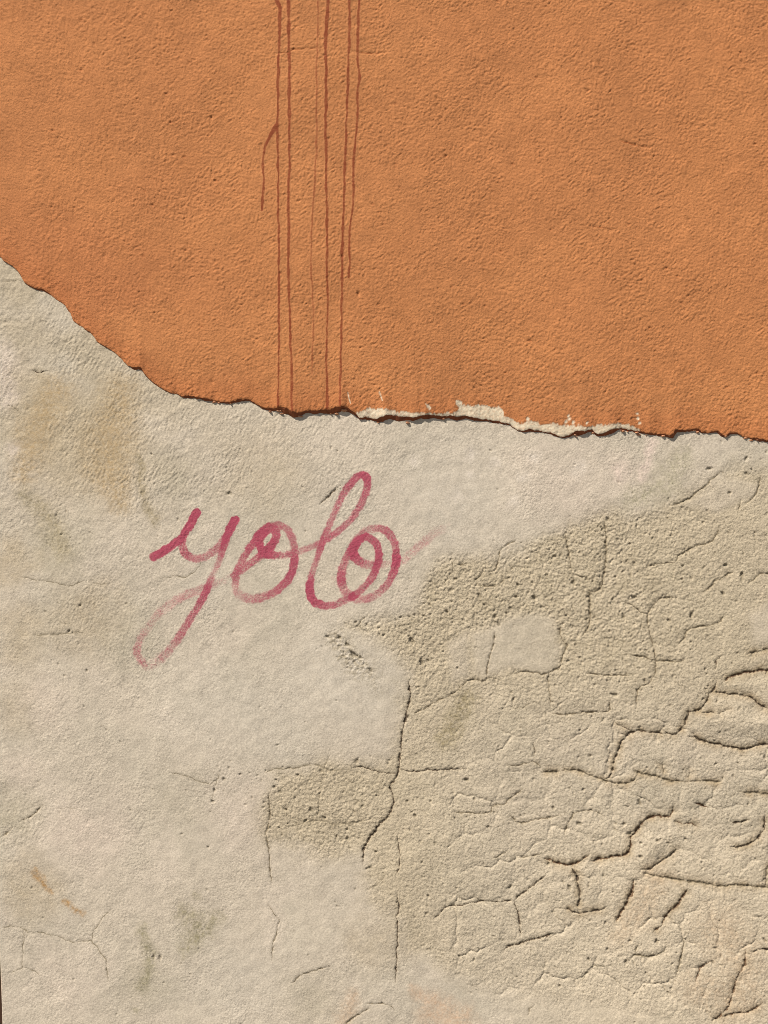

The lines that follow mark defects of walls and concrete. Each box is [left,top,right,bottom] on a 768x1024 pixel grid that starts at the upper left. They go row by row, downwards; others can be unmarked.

flaking render [0,257,768,1024]
crack [265,523,768,981]
crack [671,474,718,506]
crack [712,948,768,1021]